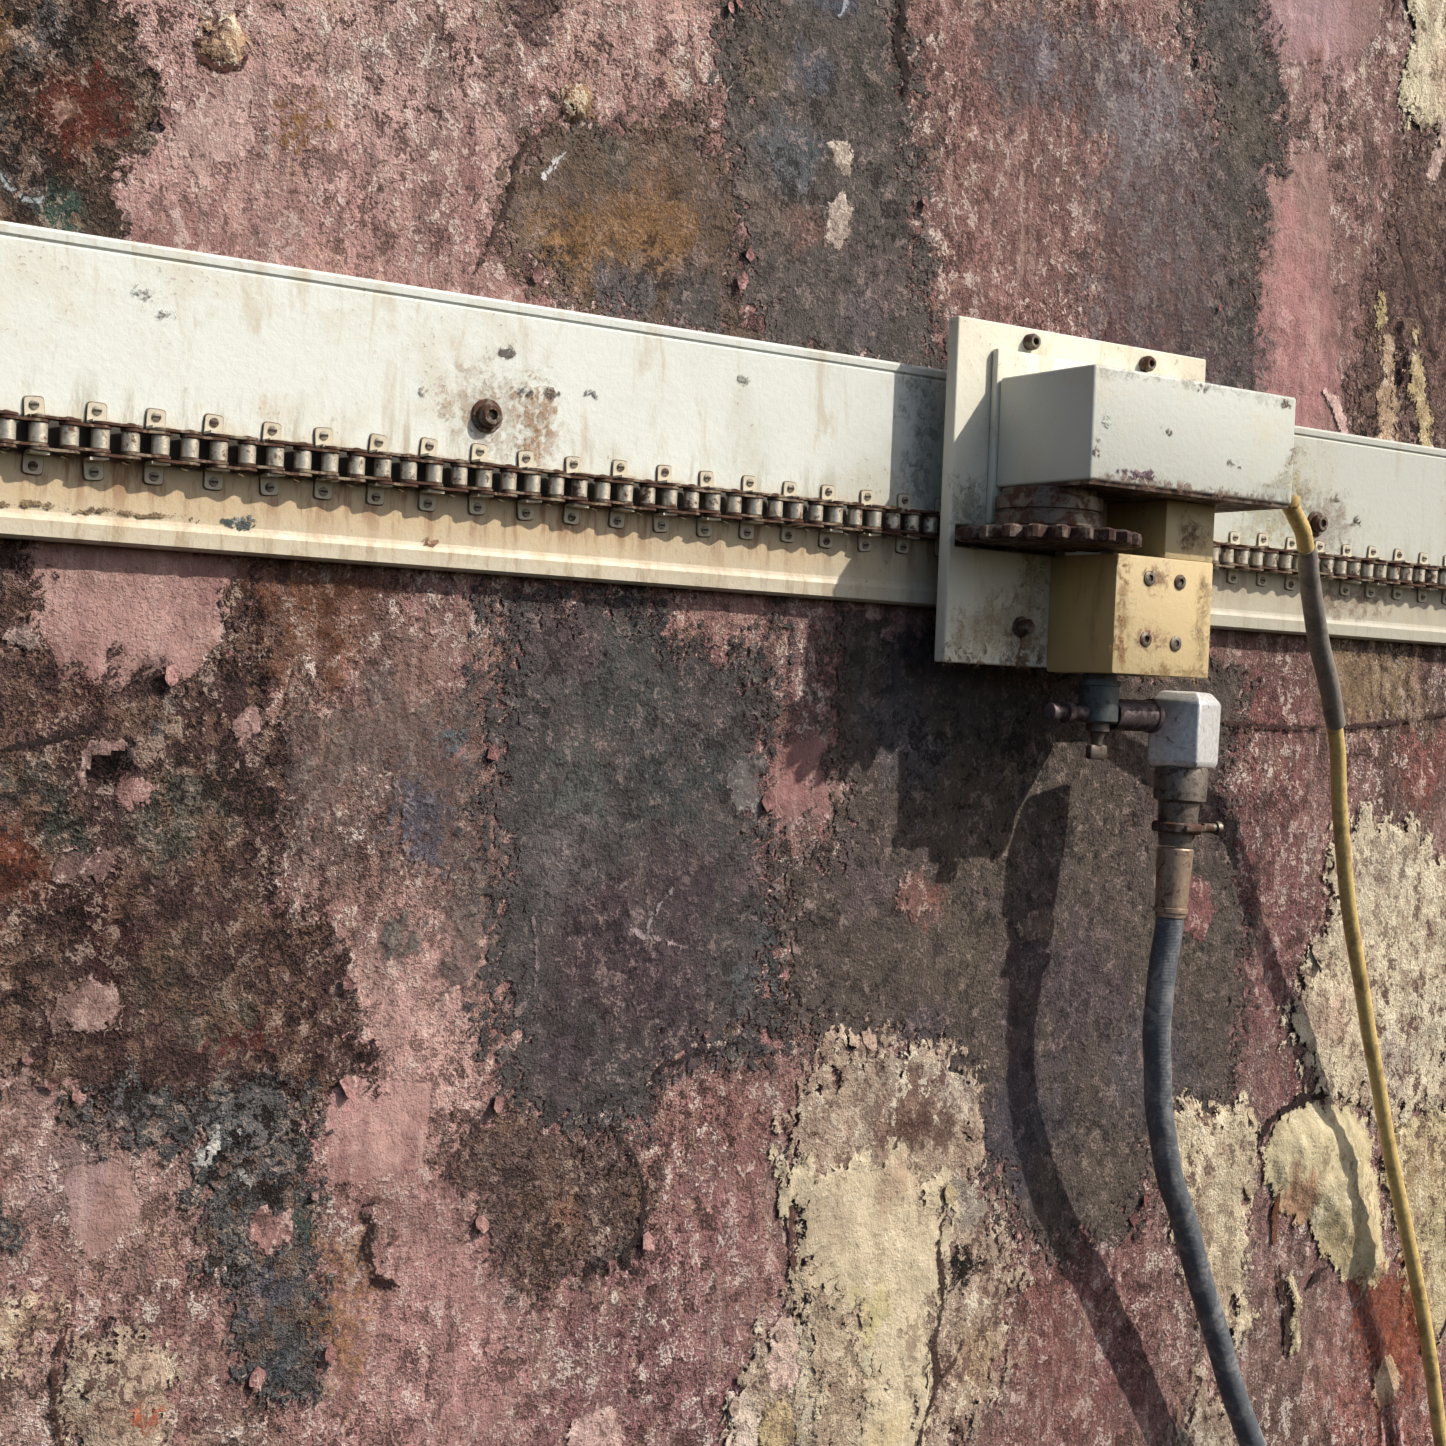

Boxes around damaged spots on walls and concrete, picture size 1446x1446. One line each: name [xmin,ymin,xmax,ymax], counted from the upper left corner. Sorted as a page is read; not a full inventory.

corrosion [527,190,699,284]
leakage [726,753,768,815]
peeling [0,538,390,1446]
peeling [429,574,1269,1311]
peeling [1311,942,1327,971]
crack [359,1196,401,1290]
crack [788,1205,797,1273]
peeling [766,1312,802,1392]
crack [918,1210,965,1446]
crack [1436,1321,1446,1346]